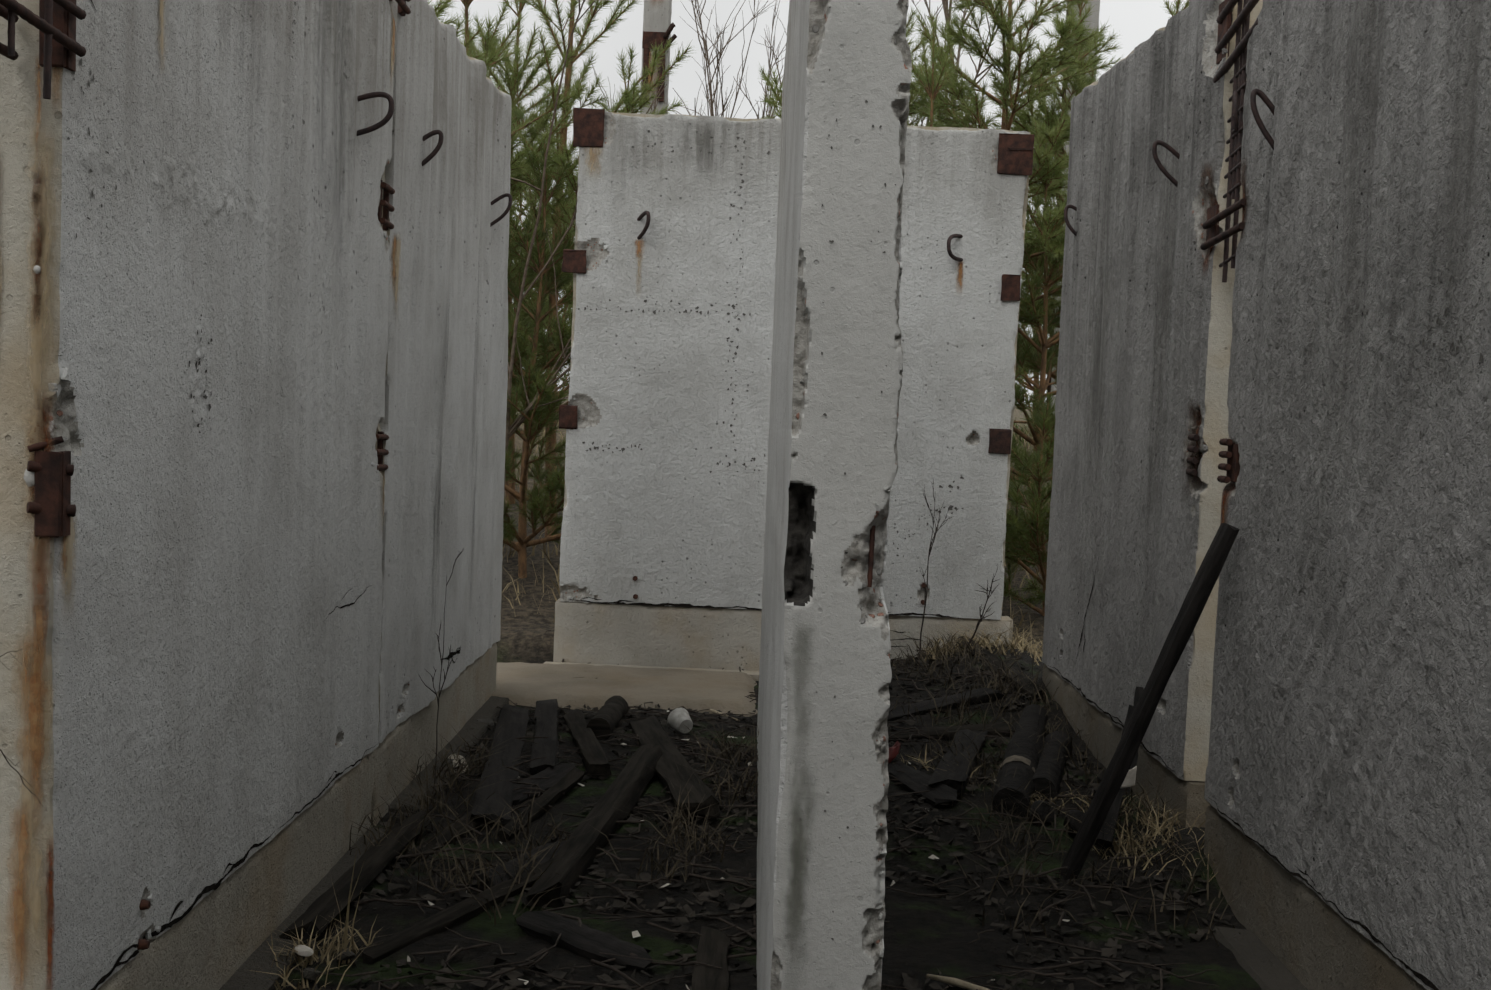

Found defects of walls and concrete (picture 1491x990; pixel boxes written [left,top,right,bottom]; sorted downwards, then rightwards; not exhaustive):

spalling [603,112,616,145]
corrosion [28,62,59,461]
spalling [568,123,765,473]
spalling [792,250,824,436]
spalling [841,0,964,658]
corrosion [62,517,75,594]
crack [324,585,371,621]
spalling [784,482,816,606]
corrosion [10,536,54,989]
spalling [872,683,890,877]